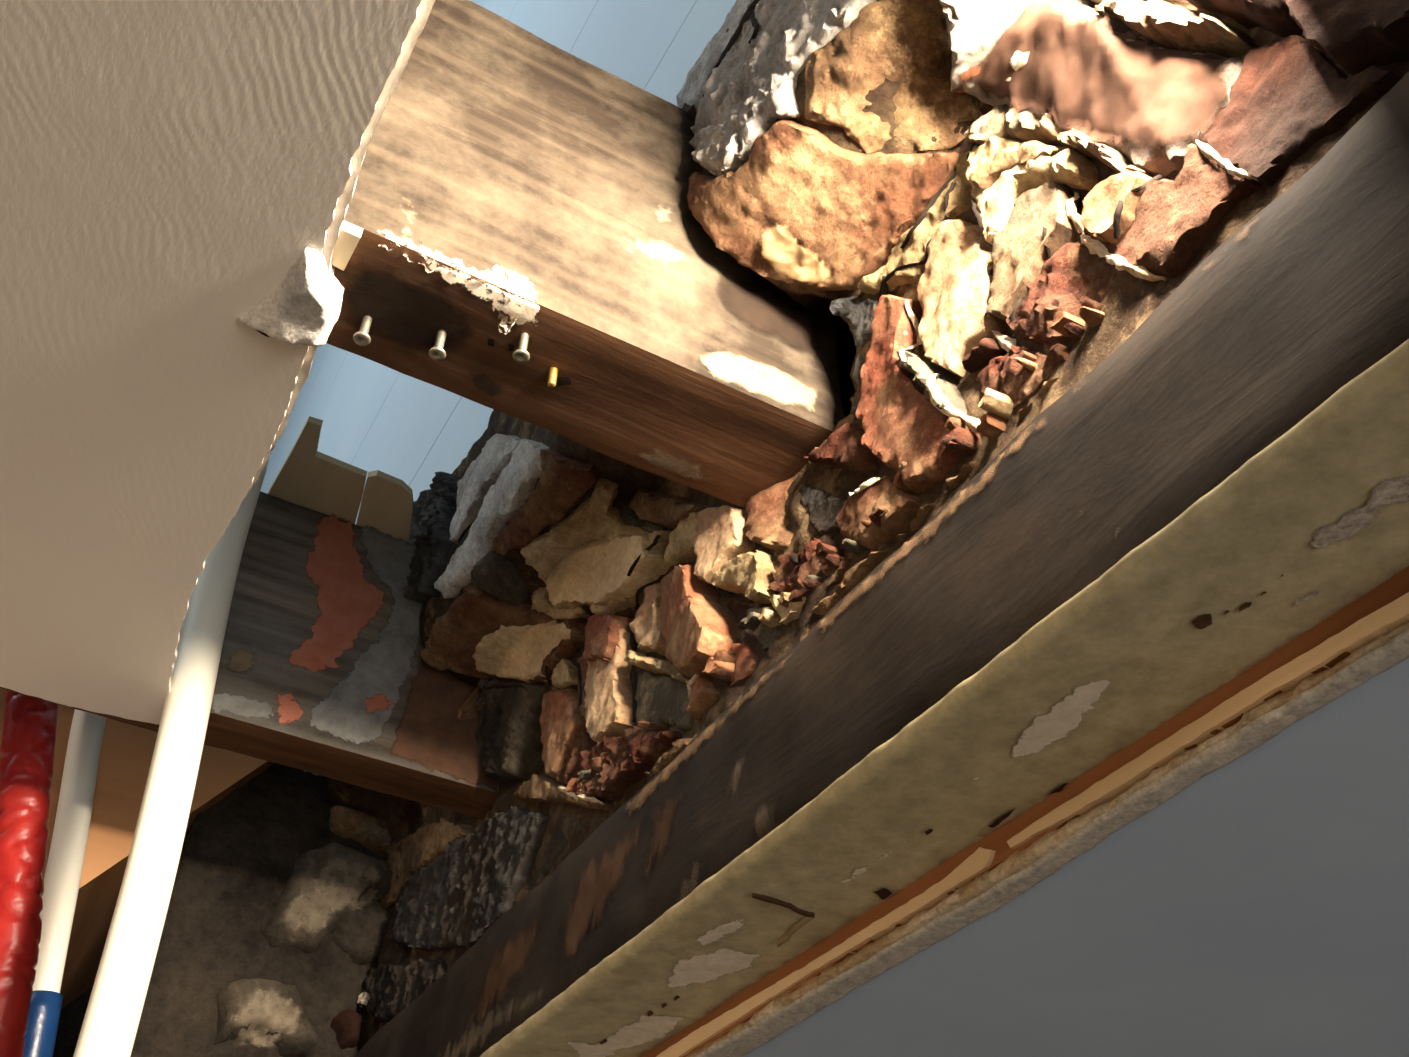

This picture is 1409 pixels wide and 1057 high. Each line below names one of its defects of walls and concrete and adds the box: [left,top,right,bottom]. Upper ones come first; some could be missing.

crack [703,0,760,97]
flaking render [236,247,344,347]
leakage [346,229,540,351]
flaking render [686,622,1409,1057]
peeling [667,919,760,989]
peeling [566,1015,684,1057]